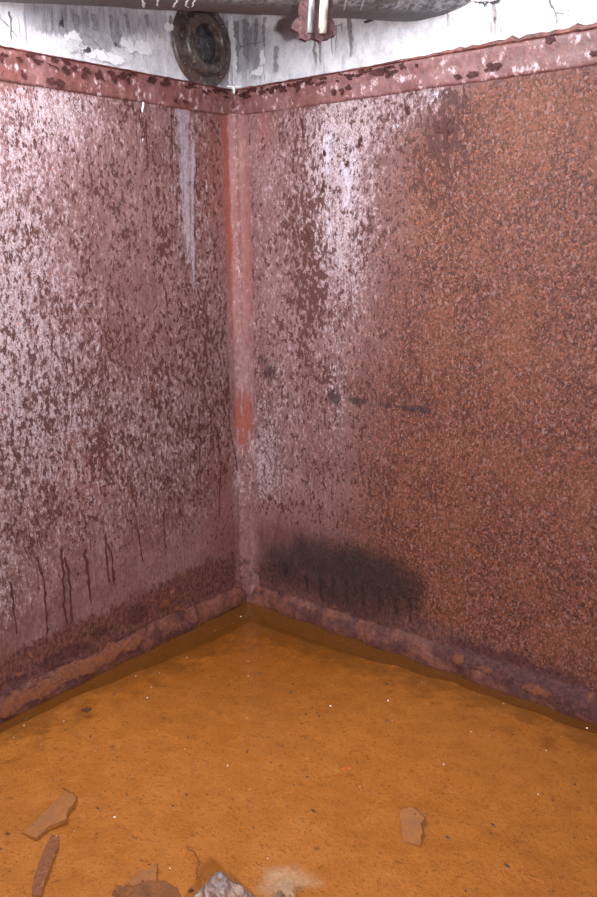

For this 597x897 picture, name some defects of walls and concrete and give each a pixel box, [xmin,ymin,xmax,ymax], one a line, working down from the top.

crack [548,0,569,23]
corrosion [0,52,137,87]
corrosion [184,62,418,99]
corrosion [454,62,501,79]
efflorescence [177,108,195,279]
corrosion [36,557,49,634]
corrosion [60,549,73,624]
corrosion [83,548,92,604]
corrosion [104,533,115,583]
damp [268,538,418,613]
corrosion [0,633,144,718]